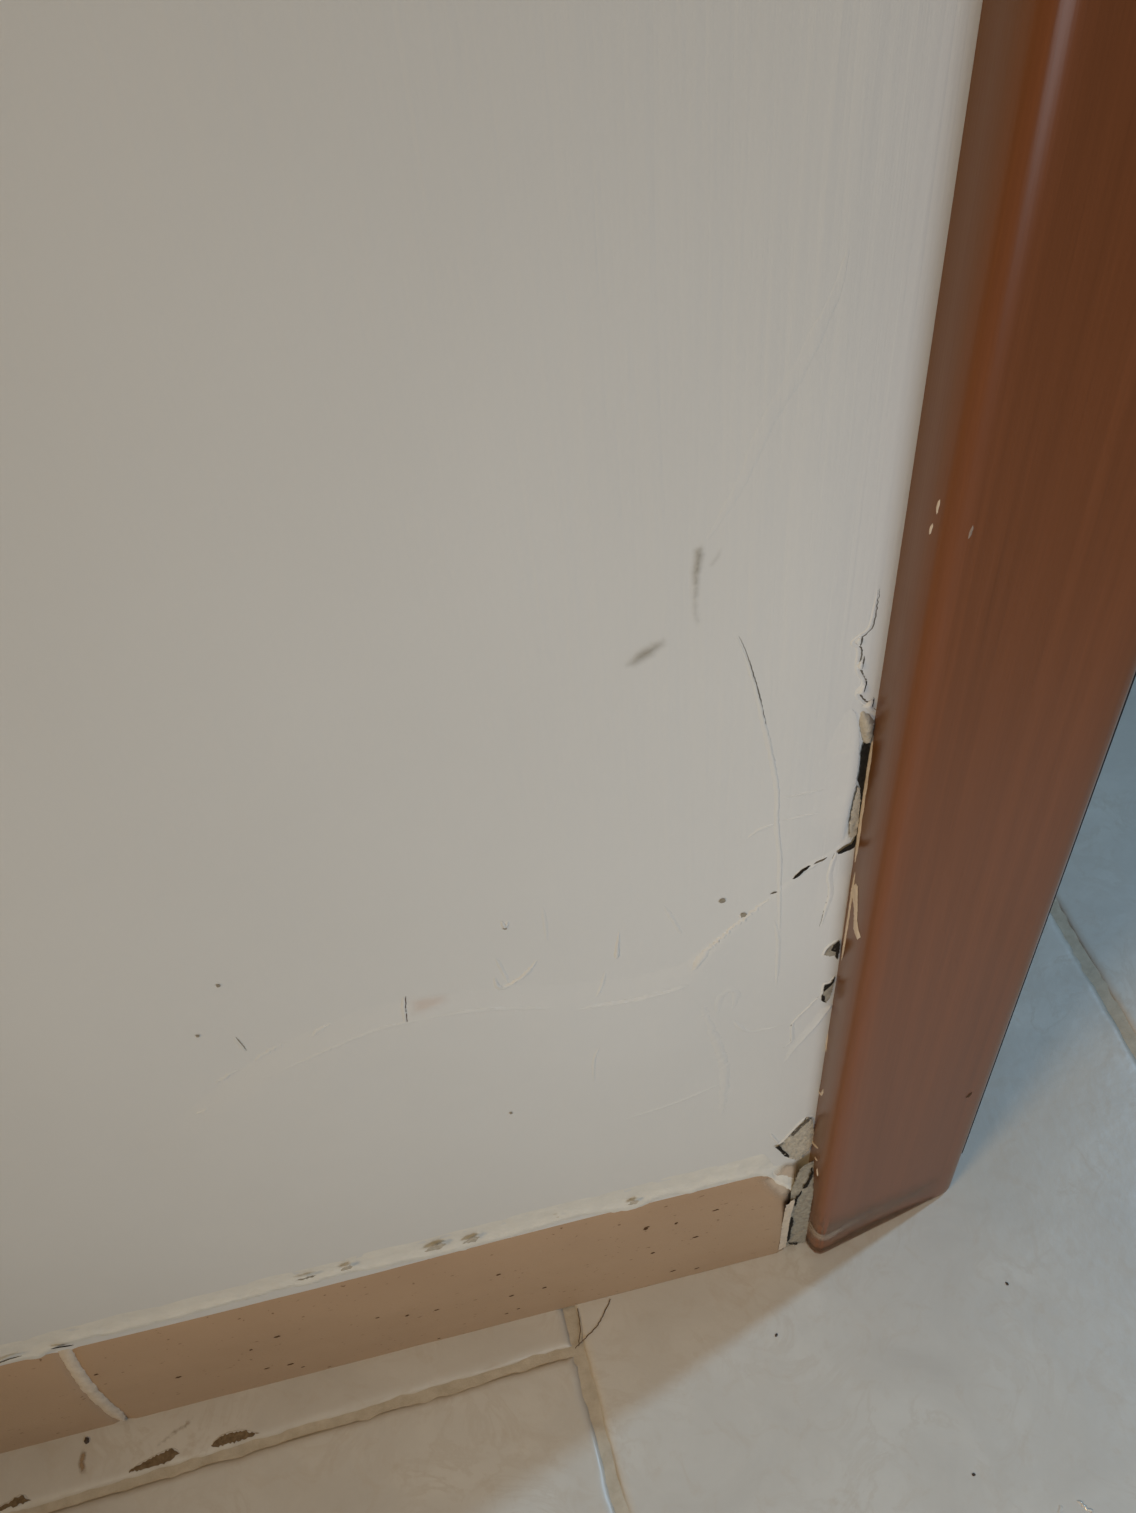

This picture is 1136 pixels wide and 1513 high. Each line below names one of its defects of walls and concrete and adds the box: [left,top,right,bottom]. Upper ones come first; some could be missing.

crack [692,637,827,971]
flaking render [783,884,860,1063]
peeling [0,1117,818,1365]